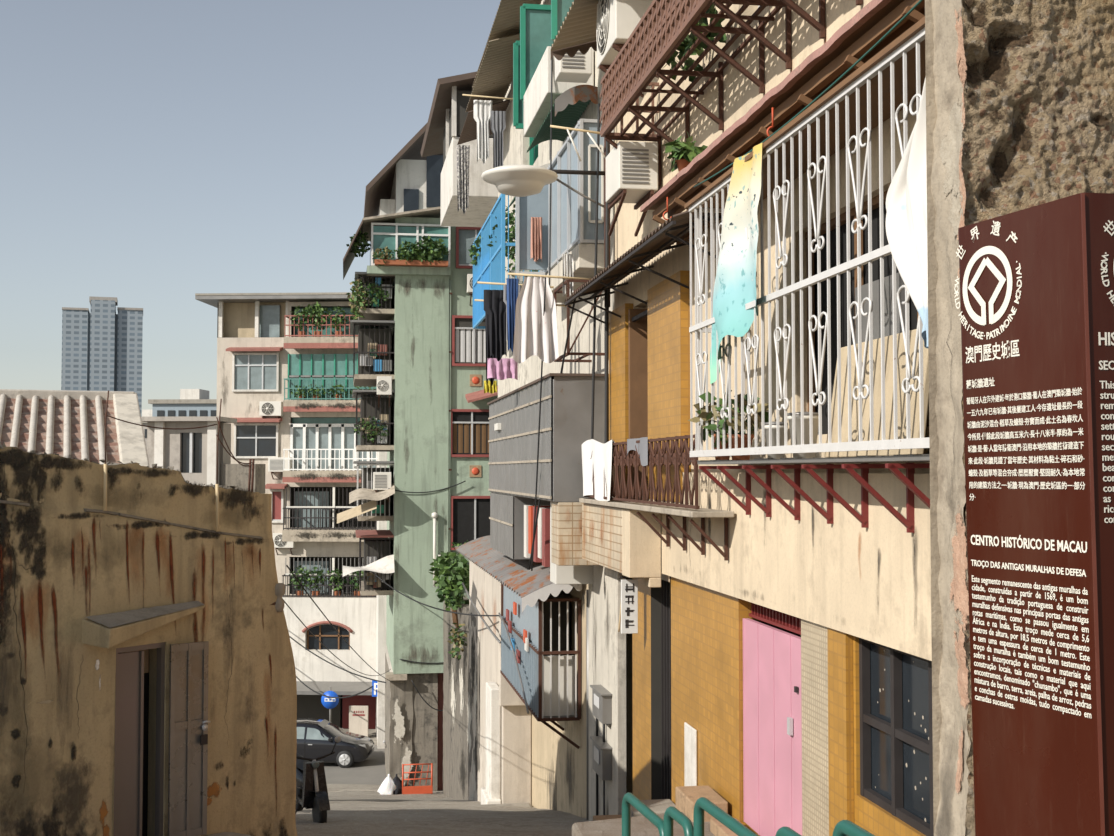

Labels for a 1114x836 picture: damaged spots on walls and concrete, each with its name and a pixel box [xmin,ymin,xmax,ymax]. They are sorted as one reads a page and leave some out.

damp [0,448,91,658]
corrosion [38,583,59,673]
corrosion [71,519,96,609]
corrosion [142,533,174,604]
corrosion [193,540,235,642]
peeling [392,699,413,785]